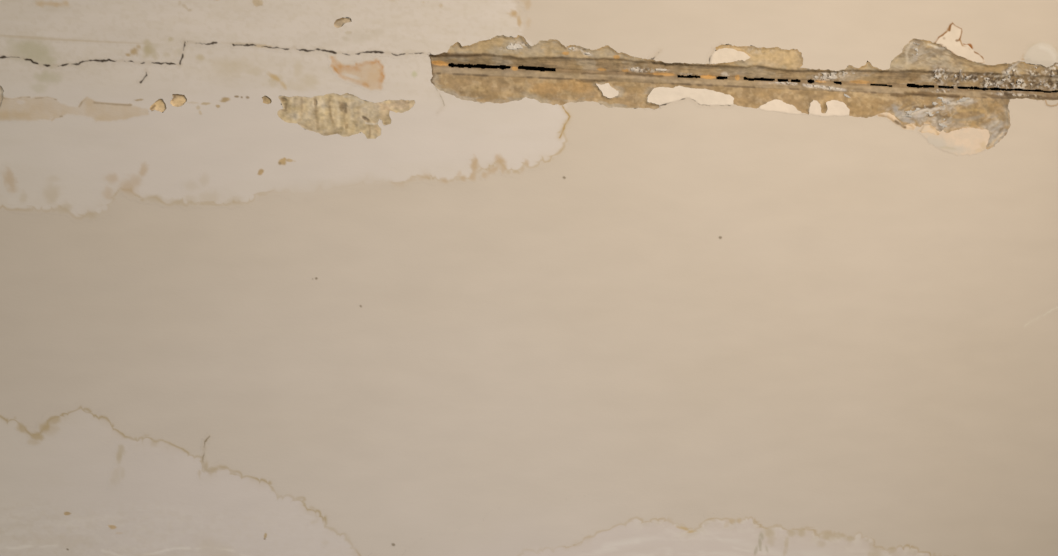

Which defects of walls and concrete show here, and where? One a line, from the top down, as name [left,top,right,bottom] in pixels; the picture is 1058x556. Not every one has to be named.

spalling [334,17,352,28]
crack [0,38,434,86]
crack [648,47,664,61]
spalling [0,86,415,139]
spalling [429,21,1058,156]
spalling [256,157,297,176]